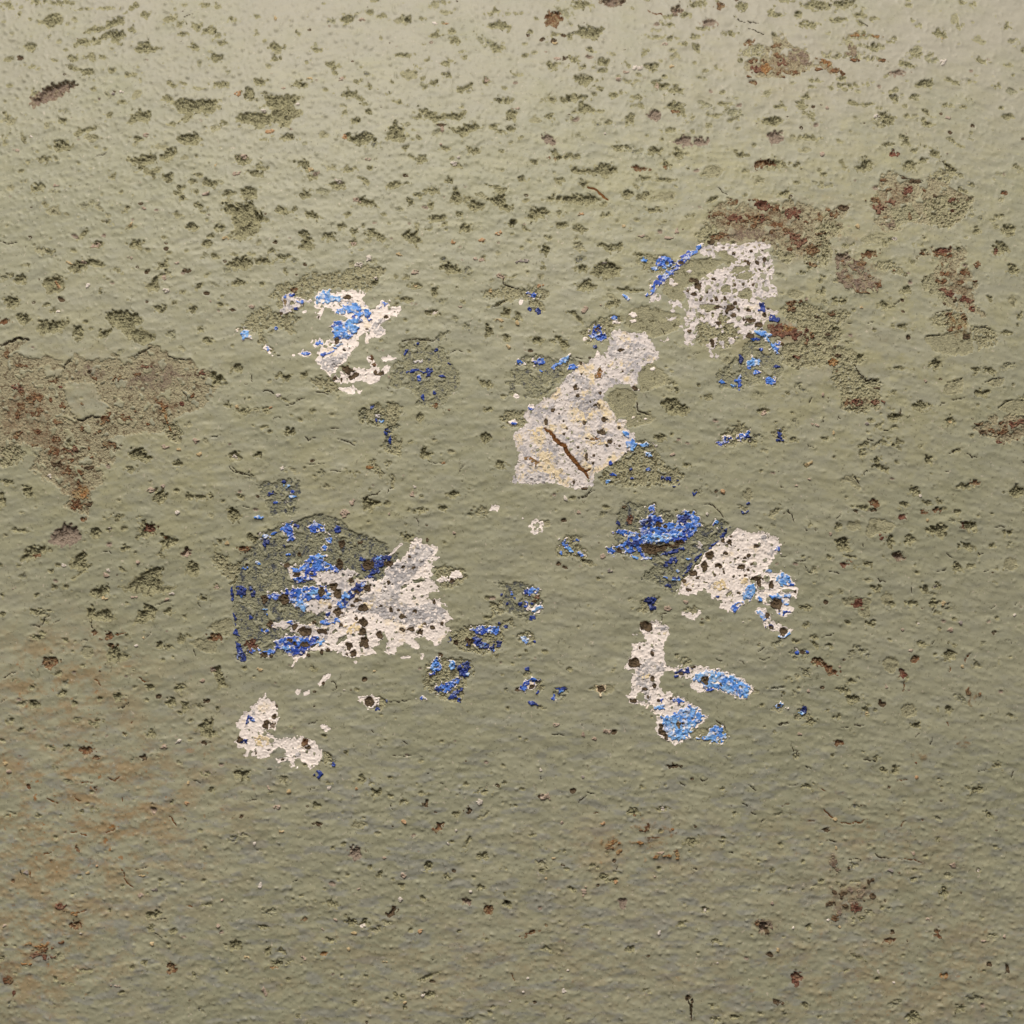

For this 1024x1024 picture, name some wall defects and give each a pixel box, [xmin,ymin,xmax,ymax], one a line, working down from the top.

corrosion [738,32,886,78]
corrosion [865,168,974,232]
corrosion [694,197,909,294]
corrosion [0,338,221,517]
peeling [0,0,1024,815]
crack [544,428,595,499]
spalling [567,851,622,897]
spalling [257,908,350,982]
spalling [766,923,815,957]
spalling [954,962,1010,1014]